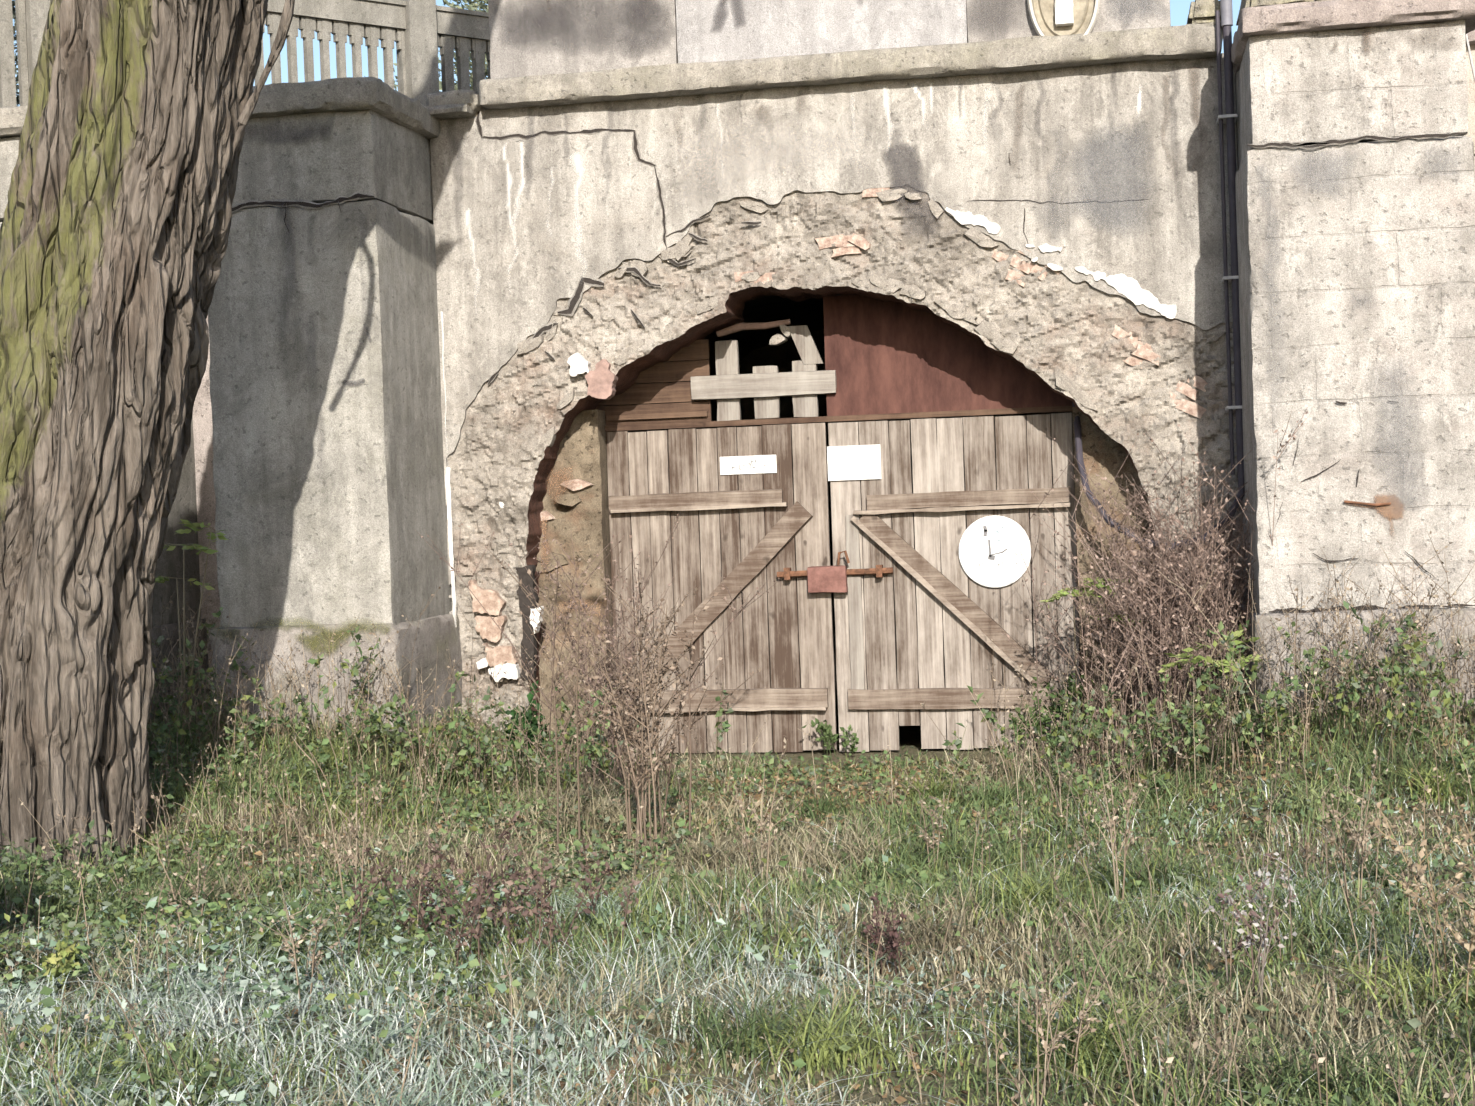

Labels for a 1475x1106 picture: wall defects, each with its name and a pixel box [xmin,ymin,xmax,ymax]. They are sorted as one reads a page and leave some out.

water stain [716,0,742,28]
flaking render [1465,45,1475,155]
crack [1247,132,1465,150]
crack [232,192,374,232]
crack [475,111,761,360]
spalling [447,187,1245,736]
corrosion [1347,495,1403,519]